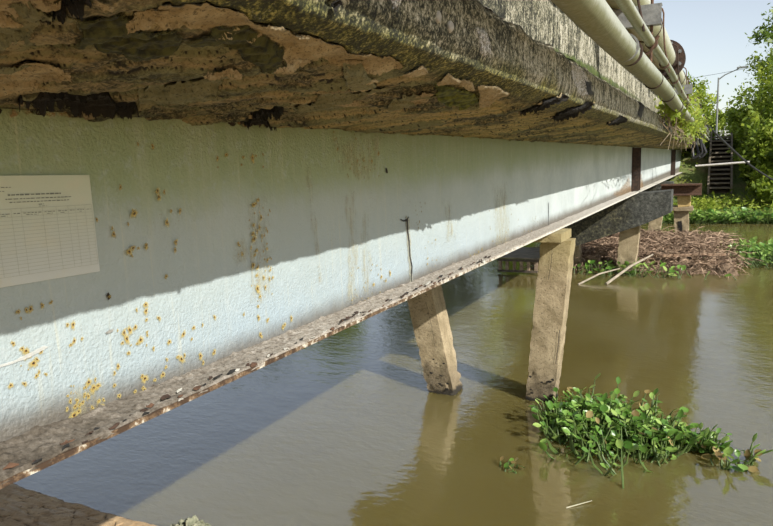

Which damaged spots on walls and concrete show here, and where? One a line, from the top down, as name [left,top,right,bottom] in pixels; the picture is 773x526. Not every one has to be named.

peeling [0,0,245,120]
spalling [240,106,284,131]
spalling [126,2,428,93]
peeling [387,73,510,112]
spalling [520,92,595,122]
leakage [572,64,594,96]
corrosion [382,250,491,307]
corrosion [117,302,161,355]
corrosion [283,310,371,350]
corrosion [11,341,48,378]
corrosion [193,353,273,390]
corrosion [60,388,183,450]